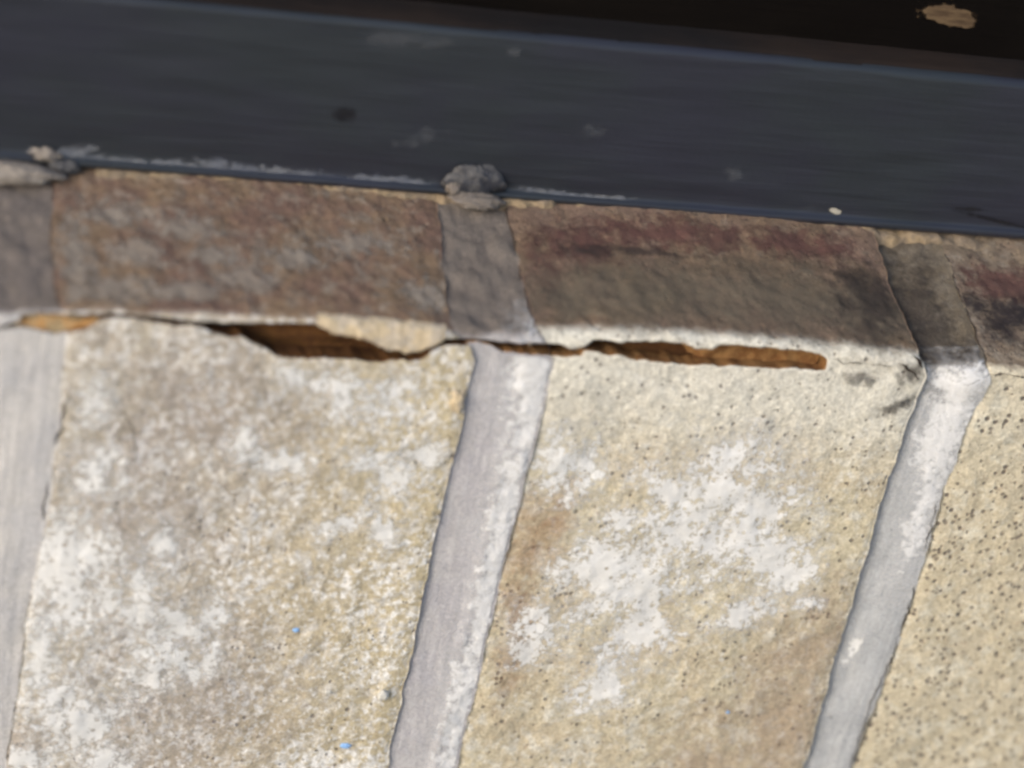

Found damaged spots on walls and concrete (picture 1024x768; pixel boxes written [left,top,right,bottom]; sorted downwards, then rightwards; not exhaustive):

crack [115,315,202,325]
crack [236,322,380,348]
crack [682,343,923,412]